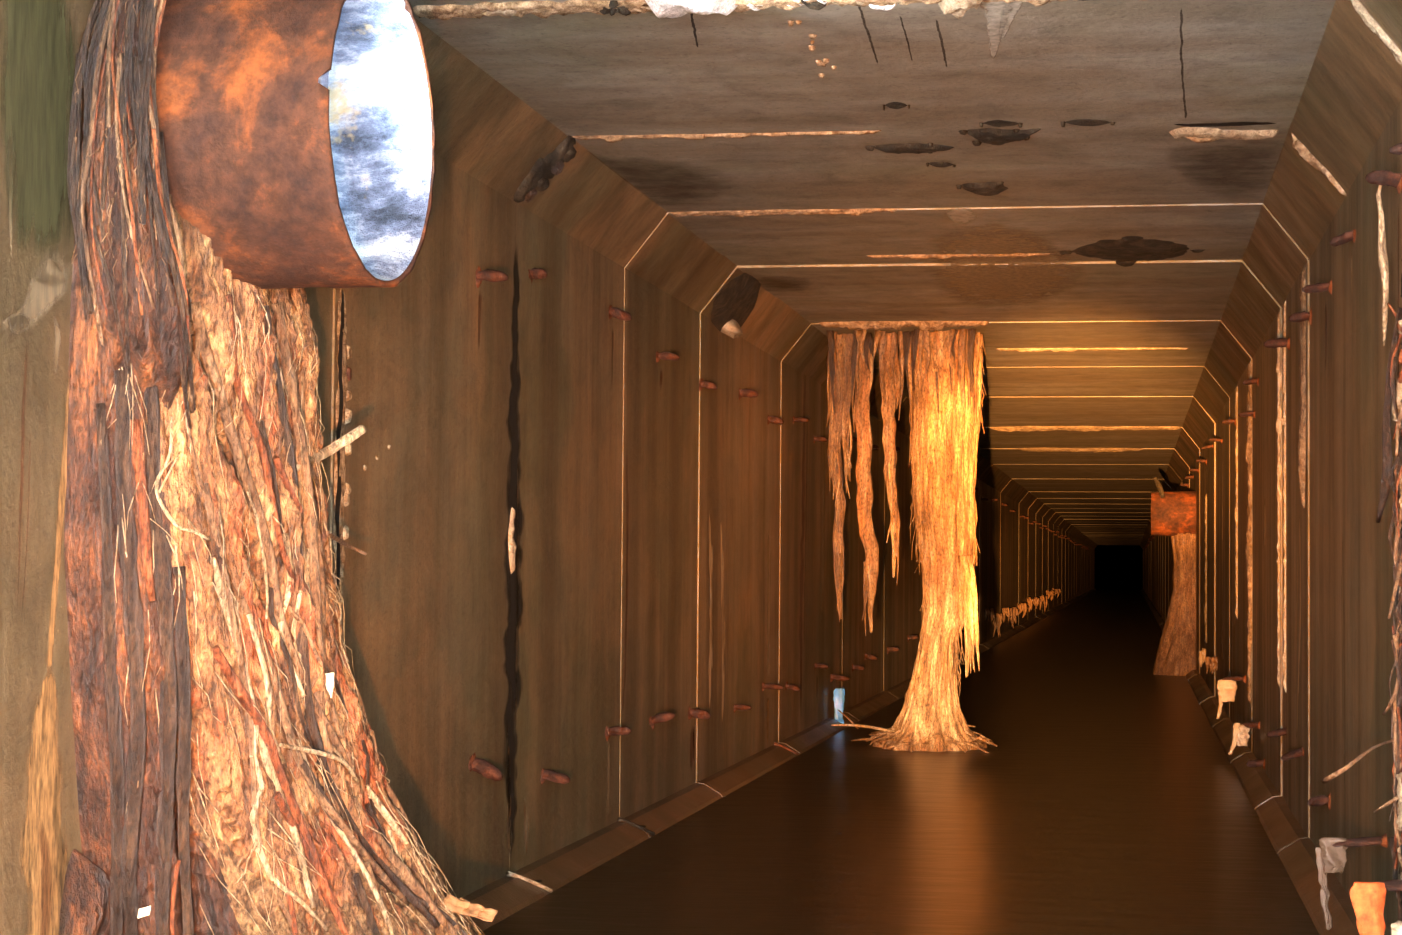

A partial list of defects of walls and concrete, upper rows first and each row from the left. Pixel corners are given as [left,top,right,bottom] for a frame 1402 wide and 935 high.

peeling [599,1,651,16]
peeling [801,0,864,10]
crack [858,6,947,67]
crack [1179,10,1187,118]
crack [504,255,553,893]